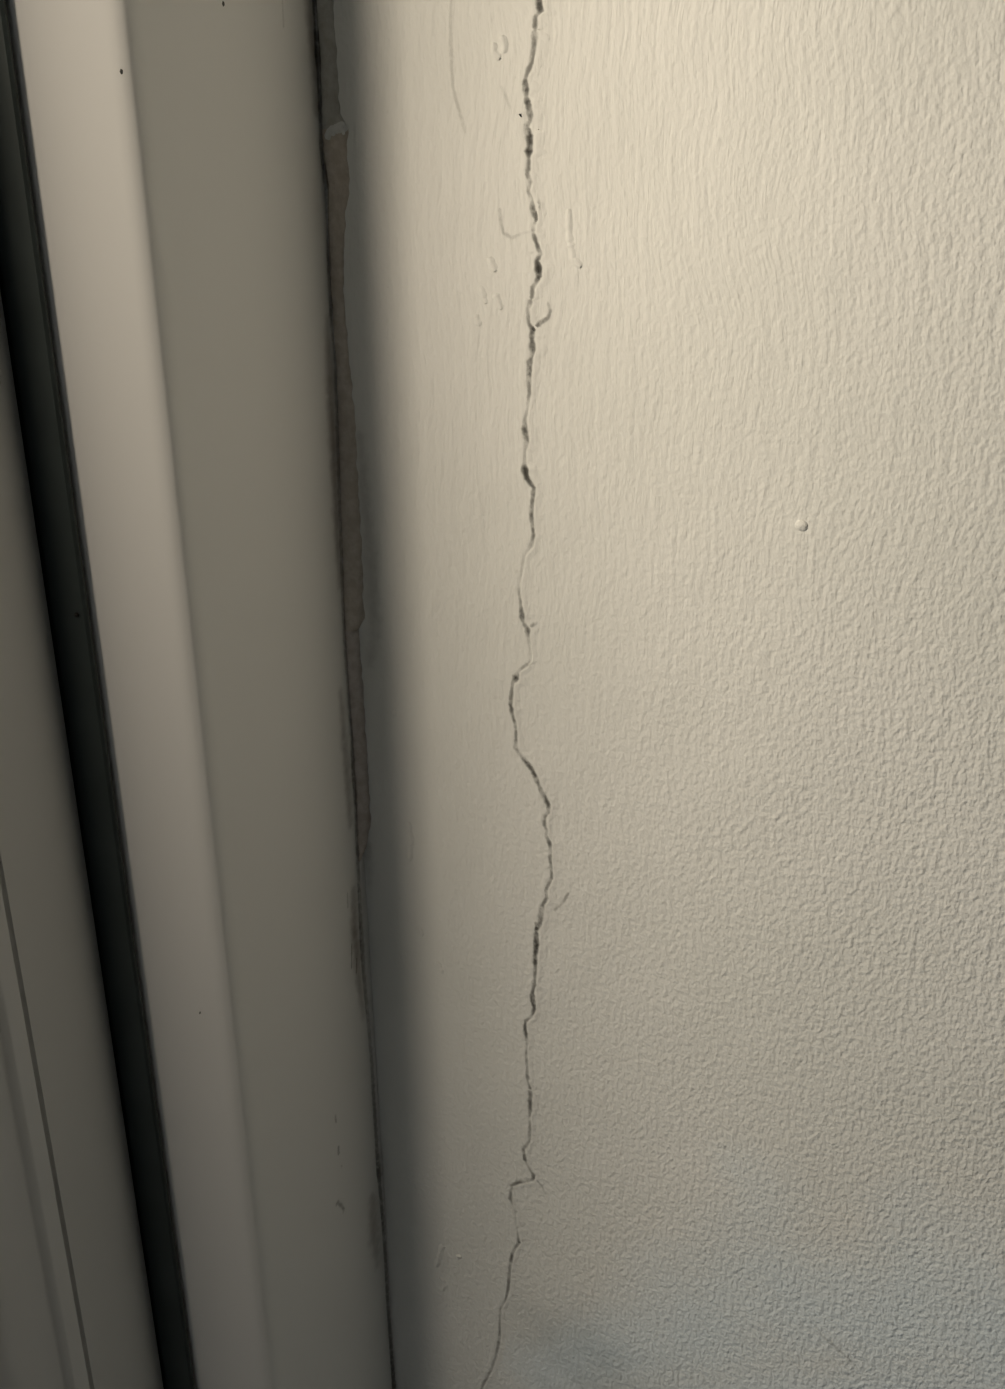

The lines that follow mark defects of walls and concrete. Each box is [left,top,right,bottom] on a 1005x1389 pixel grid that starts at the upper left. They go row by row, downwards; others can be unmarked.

crack [313,0,321,104]
crack [321,152,329,189]
crack [476,0,559,1389]
crack [374,1104,395,1389]